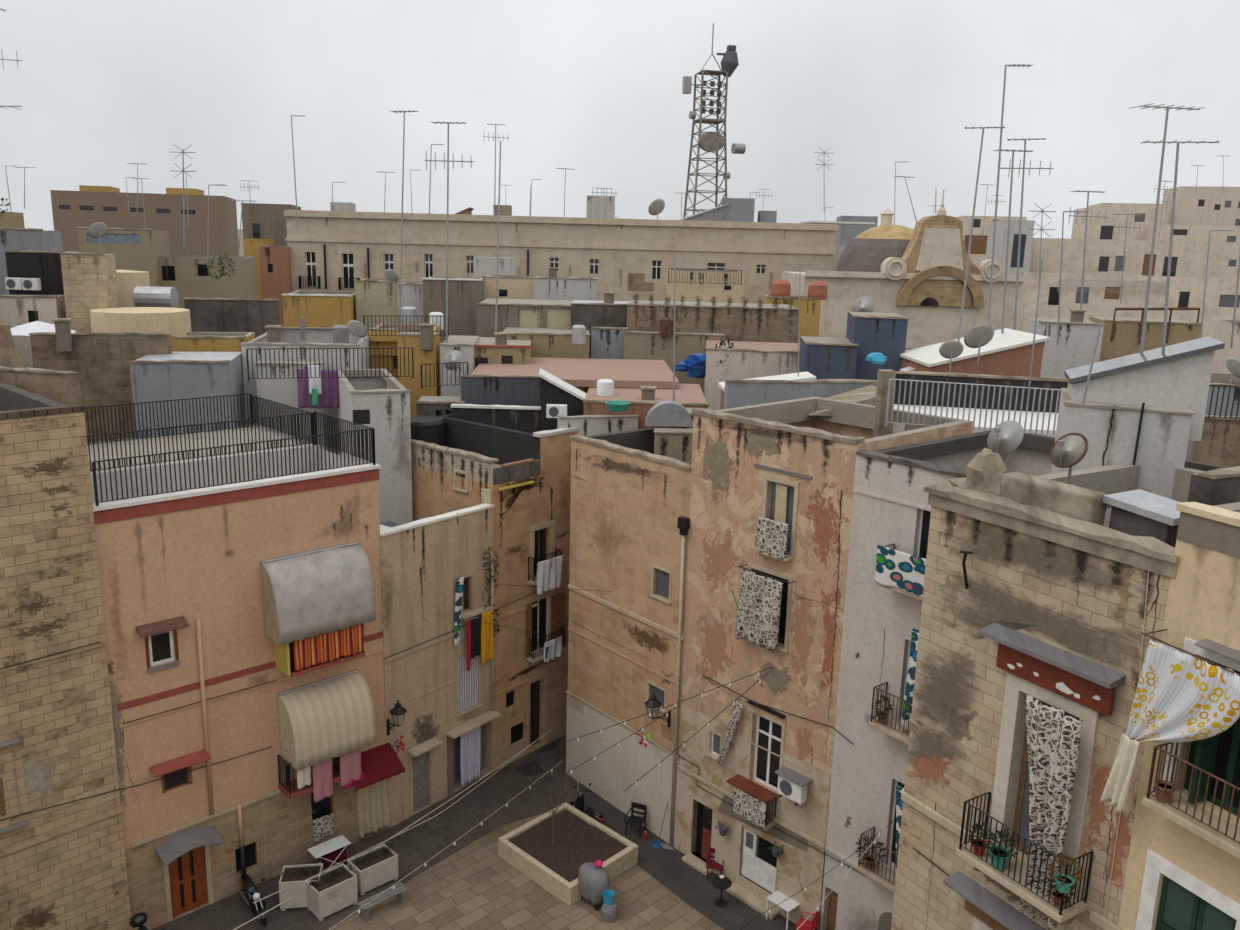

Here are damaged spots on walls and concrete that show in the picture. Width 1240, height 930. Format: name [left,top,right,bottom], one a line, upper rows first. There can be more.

peeling [698,428,781,502]
peeling [696,521,767,695]
peeling [750,479,849,705]
water stain [946,511,1121,588]
water stain [953,576,1134,663]
water stain [1140,570,1154,618]
water stain [910,656,973,762]
spalling [1079,746,1136,887]